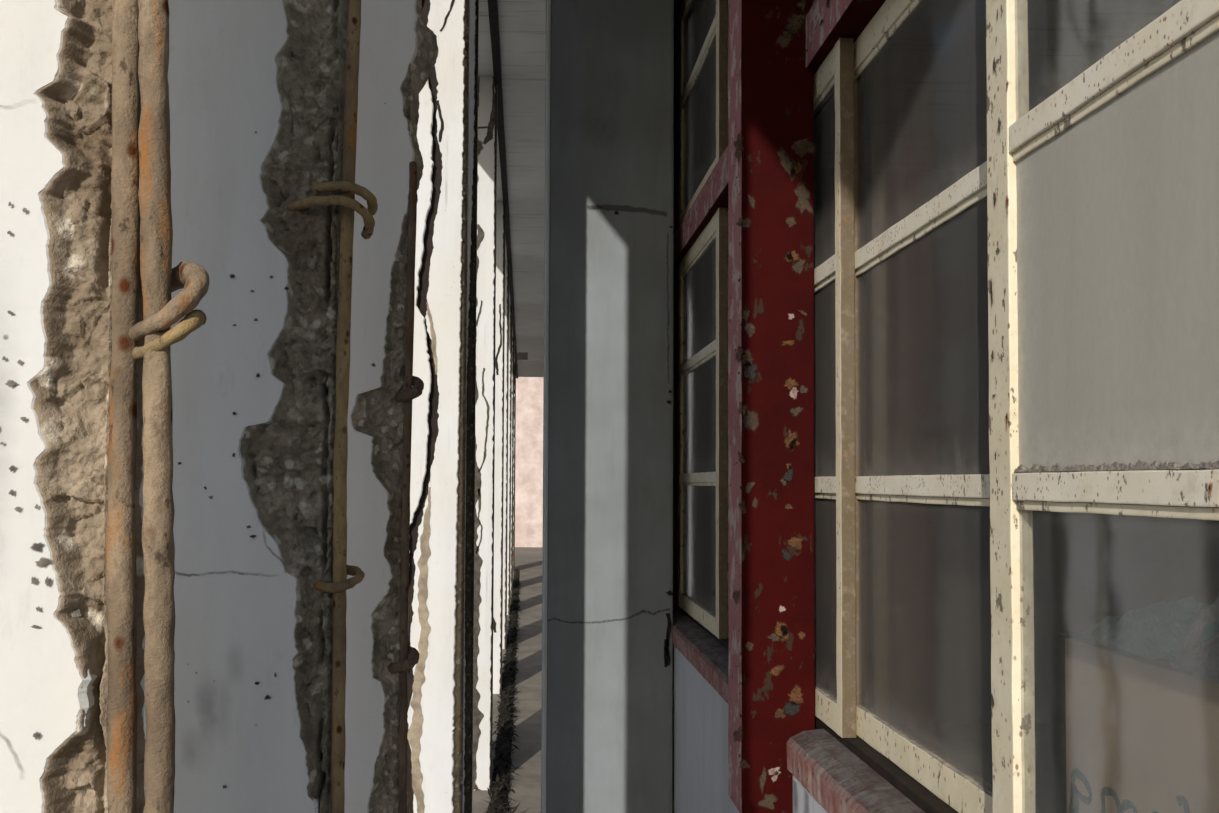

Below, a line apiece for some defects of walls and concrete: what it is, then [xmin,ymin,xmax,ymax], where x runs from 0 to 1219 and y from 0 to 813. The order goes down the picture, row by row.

crack [421,0,455,31]
peeling [777,139,816,227]
peeling [786,251,805,274]
peeling [736,309,757,380]
spalling [6,0,182,813]
spalling [232,0,439,813]
crack [407,65,444,813]
peeling [780,378,807,486]
crack [547,608,670,623]
peeling [768,606,806,642]
peeling [775,686,803,718]
peeling [739,759,780,809]